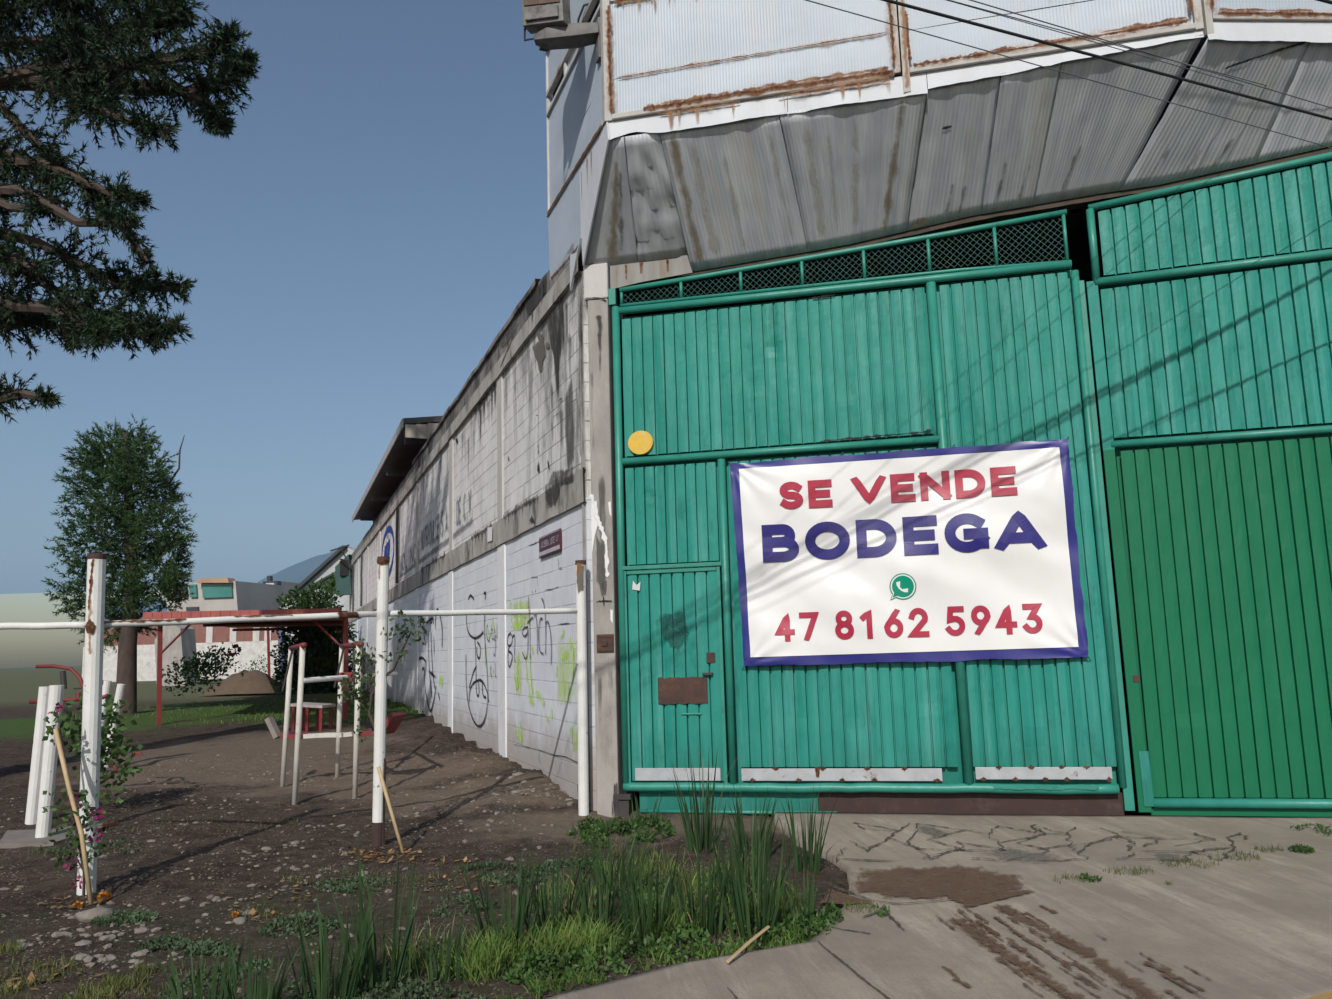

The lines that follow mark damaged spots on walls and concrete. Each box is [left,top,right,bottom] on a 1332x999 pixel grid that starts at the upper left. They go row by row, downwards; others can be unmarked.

corrosion [606,0,1332,127]
corrosion [547,126,600,214]
water stain [551,303,570,433]
corrosion [85,553,186,653]
crack [818,822,1248,999]